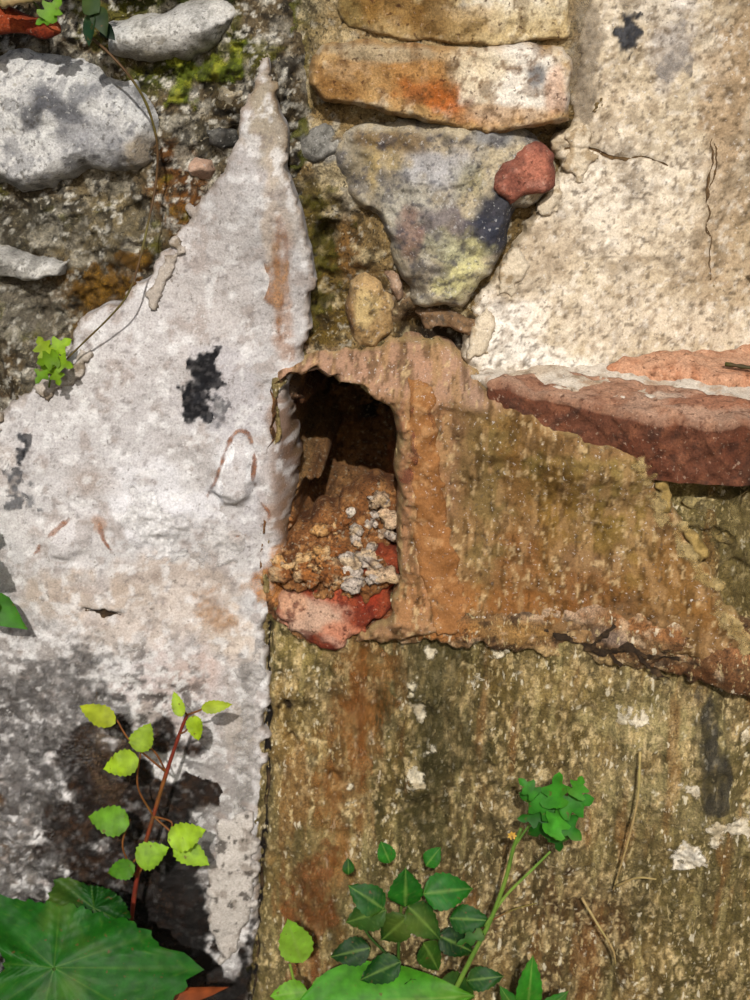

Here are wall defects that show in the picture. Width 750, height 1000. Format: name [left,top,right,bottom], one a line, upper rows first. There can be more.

crack [564,147,668,166]
crack [705,139,717,280]
leakage [176,346,226,423]
flaking render [121,485,246,566]
spalling [260,367,404,651]
leakage [0,651,258,1000]